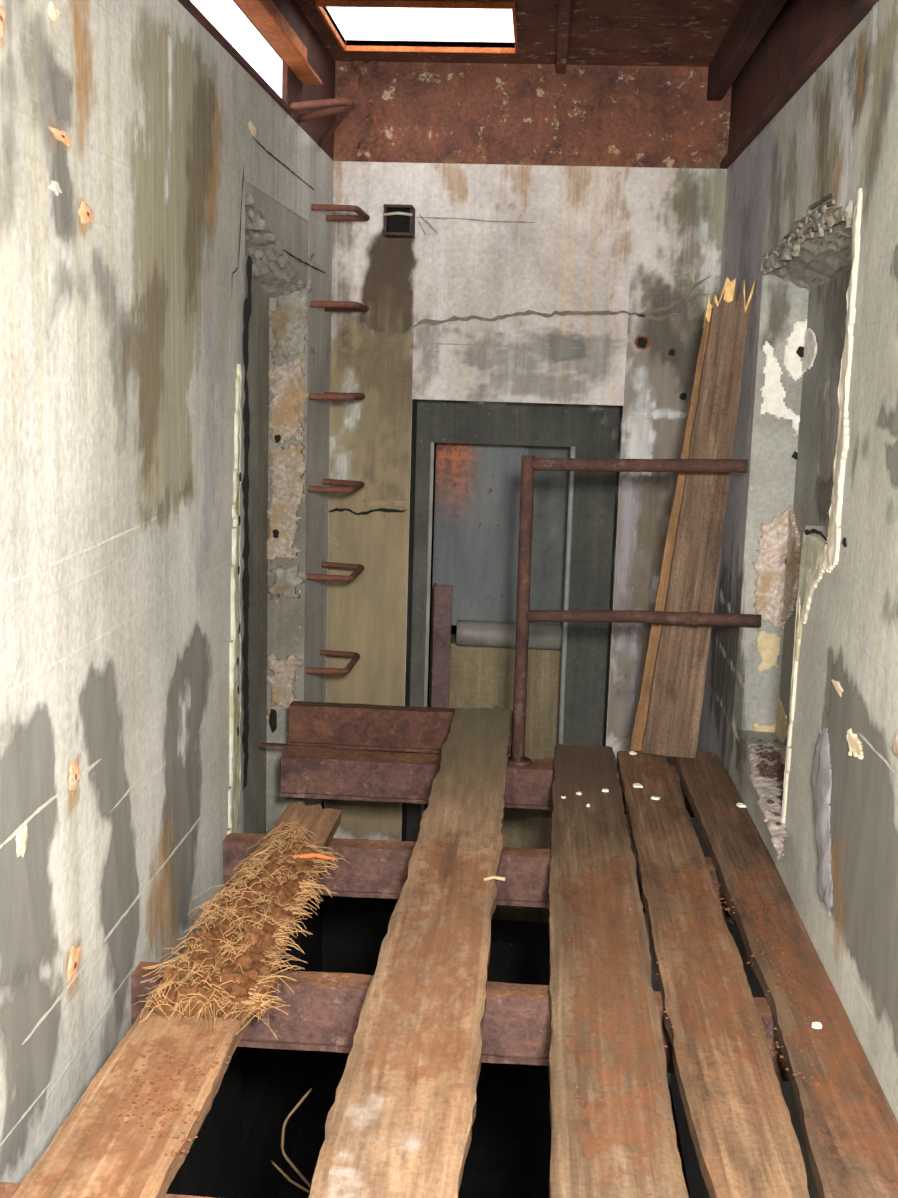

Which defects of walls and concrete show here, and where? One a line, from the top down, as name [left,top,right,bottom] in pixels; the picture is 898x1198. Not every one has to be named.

water stain [51,66,72,125]
water stain [54,145,72,236]
water stain [124,269,165,478]
crack [328,498,406,515]
water stain [326,229,416,706]
crack [412,276,711,349]
flaking render [752,188,864,823]
water stain [0,707,61,1176]
water stain [79,662,139,1025]
water stain [163,625,209,933]
water stain [325,799,402,840]
water stain [821,649,898,1054]